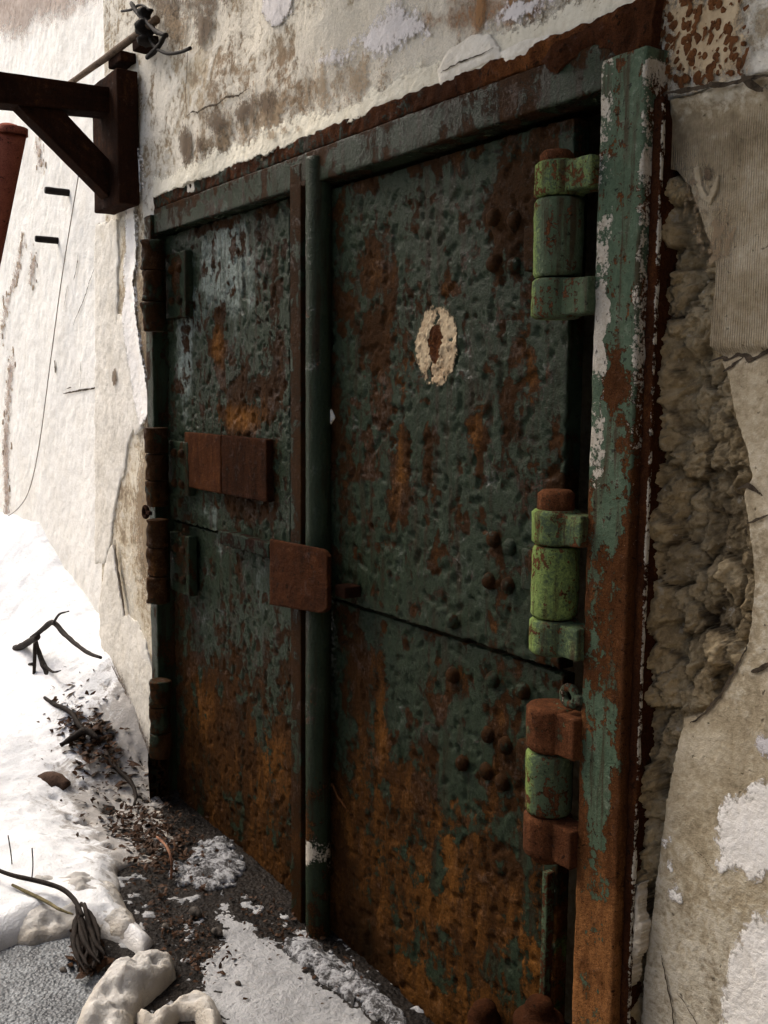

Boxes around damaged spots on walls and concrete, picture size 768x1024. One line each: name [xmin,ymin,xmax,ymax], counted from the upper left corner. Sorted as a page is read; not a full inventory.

crack [185,52,251,116]
water stain [196,42,391,158]
rust [423,0,540,35]
rust [541,0,749,92]
peeling [94,0,635,746]
spalling [630,165,755,1024]
peeling [713,778,768,884]